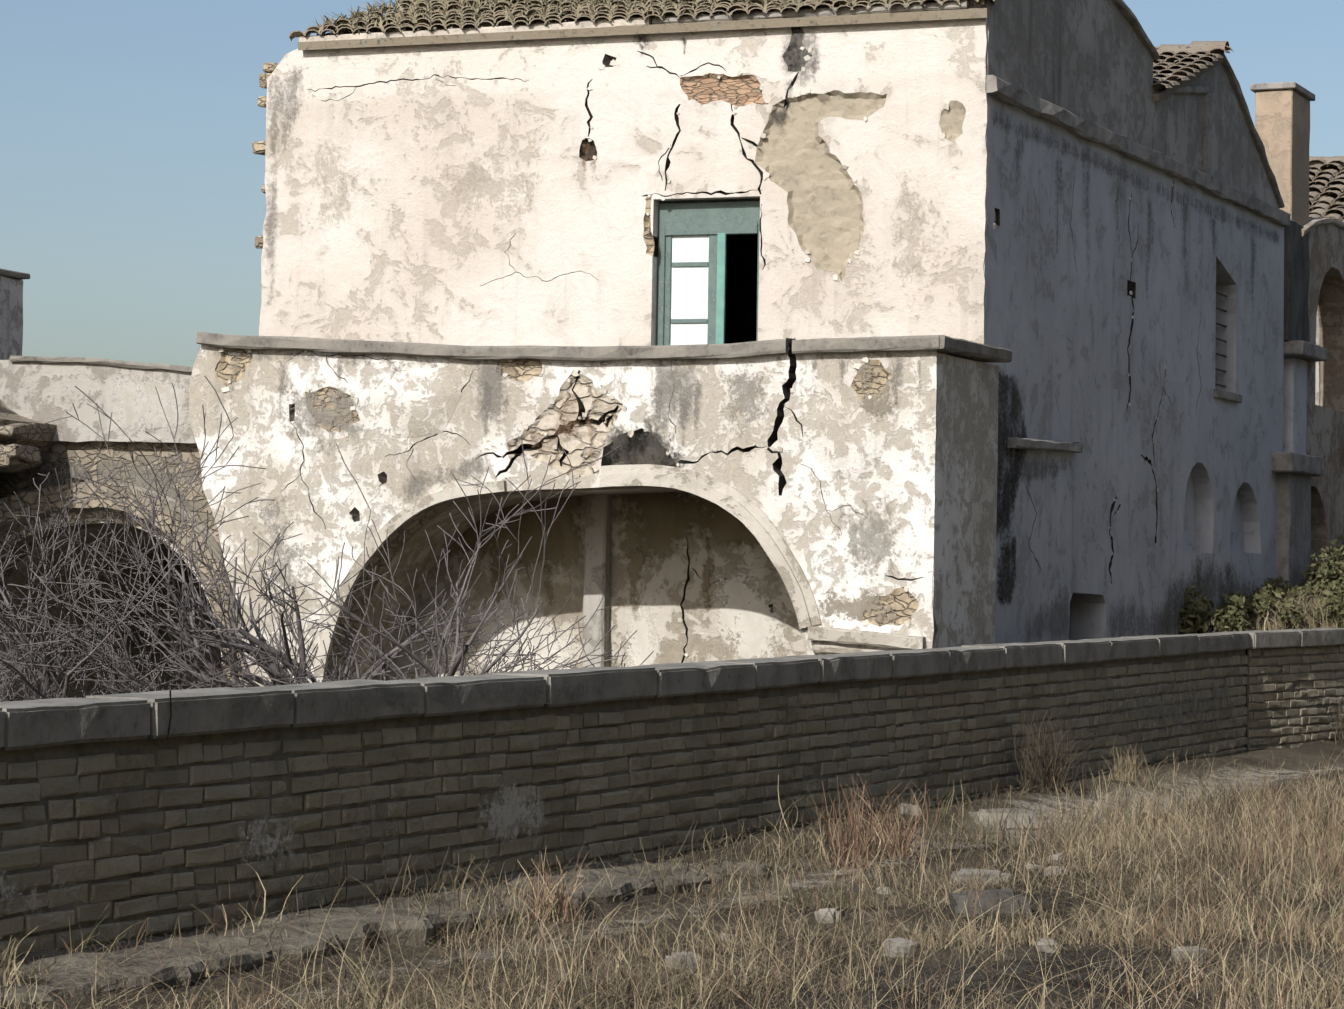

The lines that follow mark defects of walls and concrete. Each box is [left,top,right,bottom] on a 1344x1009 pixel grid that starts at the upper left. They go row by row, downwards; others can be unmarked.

crack [307,74,529,101]
crack [585,79,593,136]
crack [638,51,767,269]
flaking render [680,70,887,282]
flaking render [938,100,966,143]
spalling [0,423,42,471]
peeling [280,384,367,450]
flaking render [507,370,680,479]
crack [668,338,864,534]
flaking render [851,357,897,421]
crack [678,537,724,663]
flaking render [818,503,919,628]